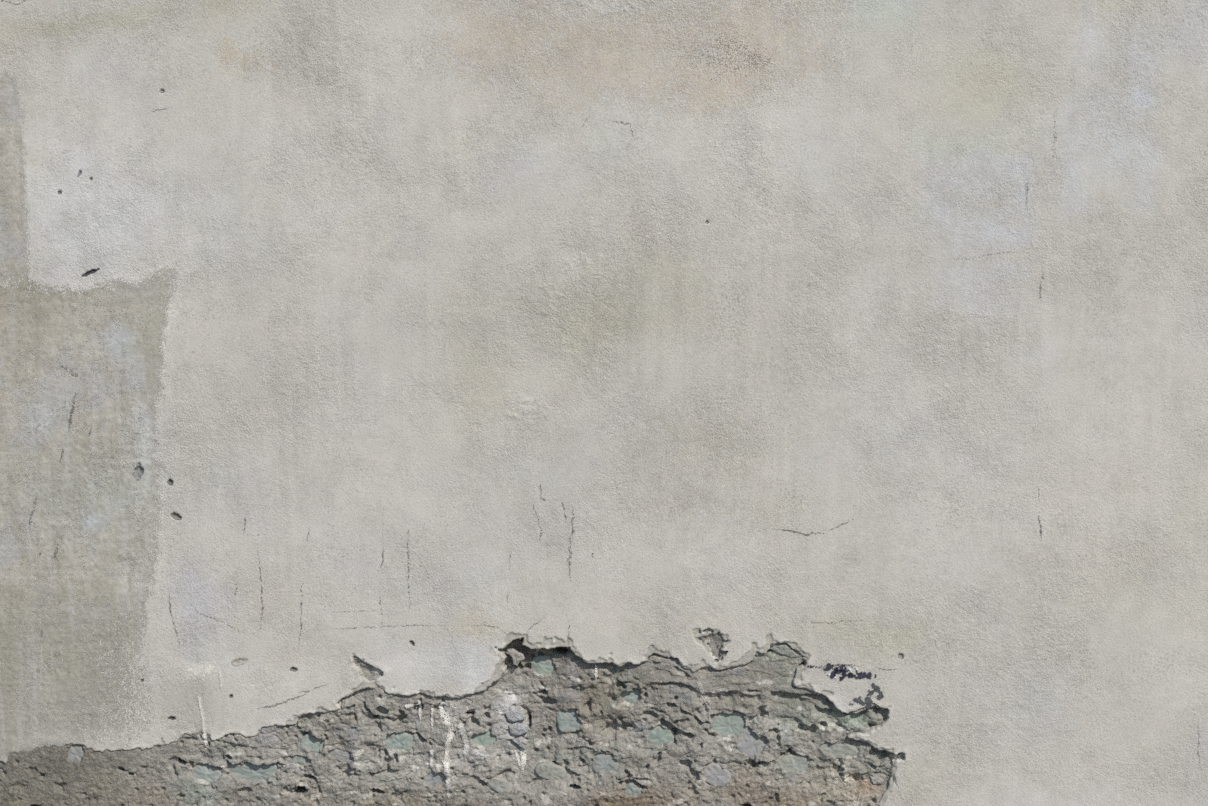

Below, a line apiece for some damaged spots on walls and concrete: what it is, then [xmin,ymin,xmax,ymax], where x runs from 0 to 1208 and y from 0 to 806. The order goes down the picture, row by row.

spalling [0,71,905,806]